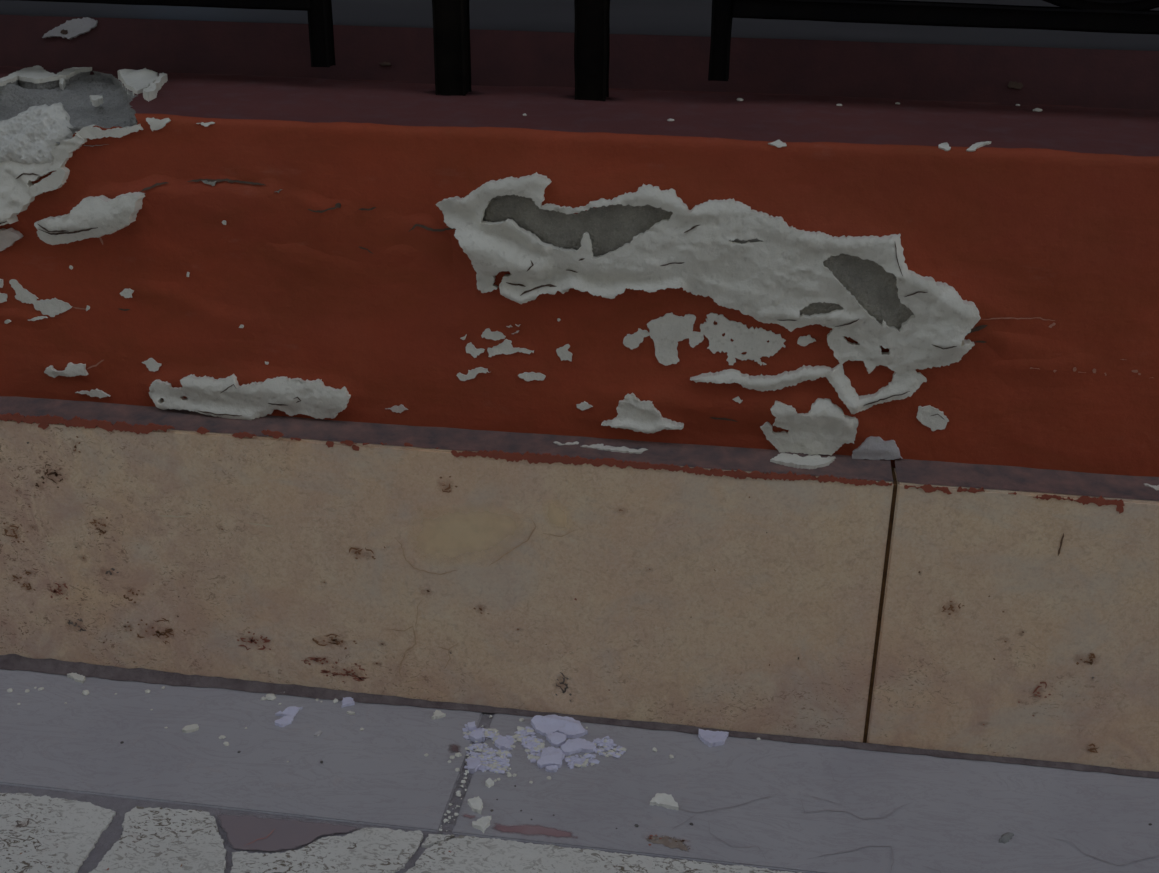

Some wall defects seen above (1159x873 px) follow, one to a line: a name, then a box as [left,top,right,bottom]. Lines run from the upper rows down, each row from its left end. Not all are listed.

flaking render [0,65,171,251]
peeling [0,279,90,321]
peeling [142,358,351,420]
flaking render [436,172,981,460]